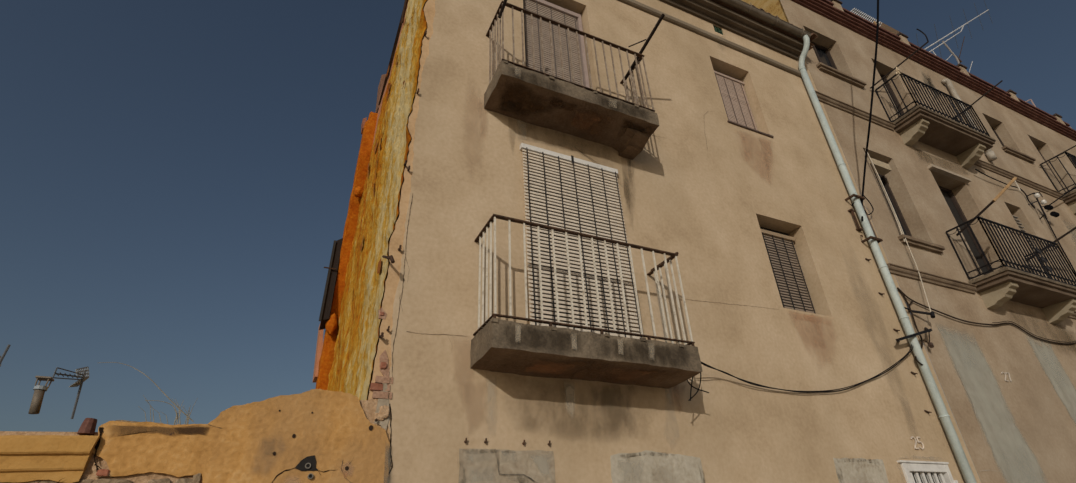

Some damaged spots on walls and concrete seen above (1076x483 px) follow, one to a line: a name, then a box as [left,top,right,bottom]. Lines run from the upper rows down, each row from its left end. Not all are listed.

flaking render [369,350,393,430]
crack [272,461,352,483]
crack [386,404,394,474]